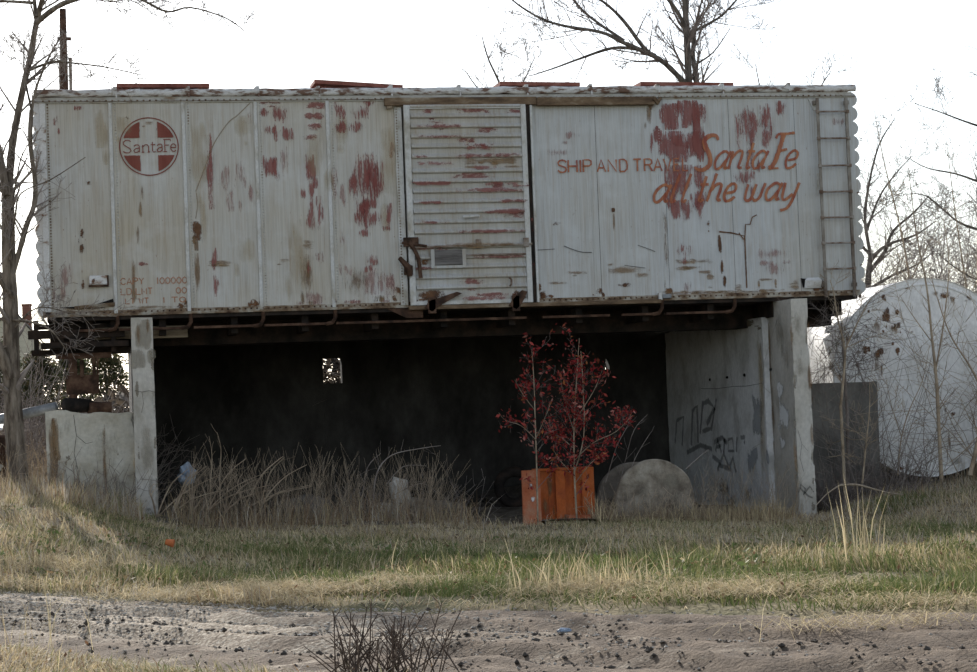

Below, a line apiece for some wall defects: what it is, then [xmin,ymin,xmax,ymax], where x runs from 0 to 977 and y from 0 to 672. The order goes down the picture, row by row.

peeling [263,155,277,177]
peeling [261,102,294,142]
peeling [301,154,323,229]
peeling [305,101,374,140]
peeling [349,151,392,237]
peeling [412,109,534,233]
peeling [650,100,706,219]
peeling [735,101,787,194]
rust [192,221,227,286]
rust [416,290,443,301]
peeling [465,278,516,301]